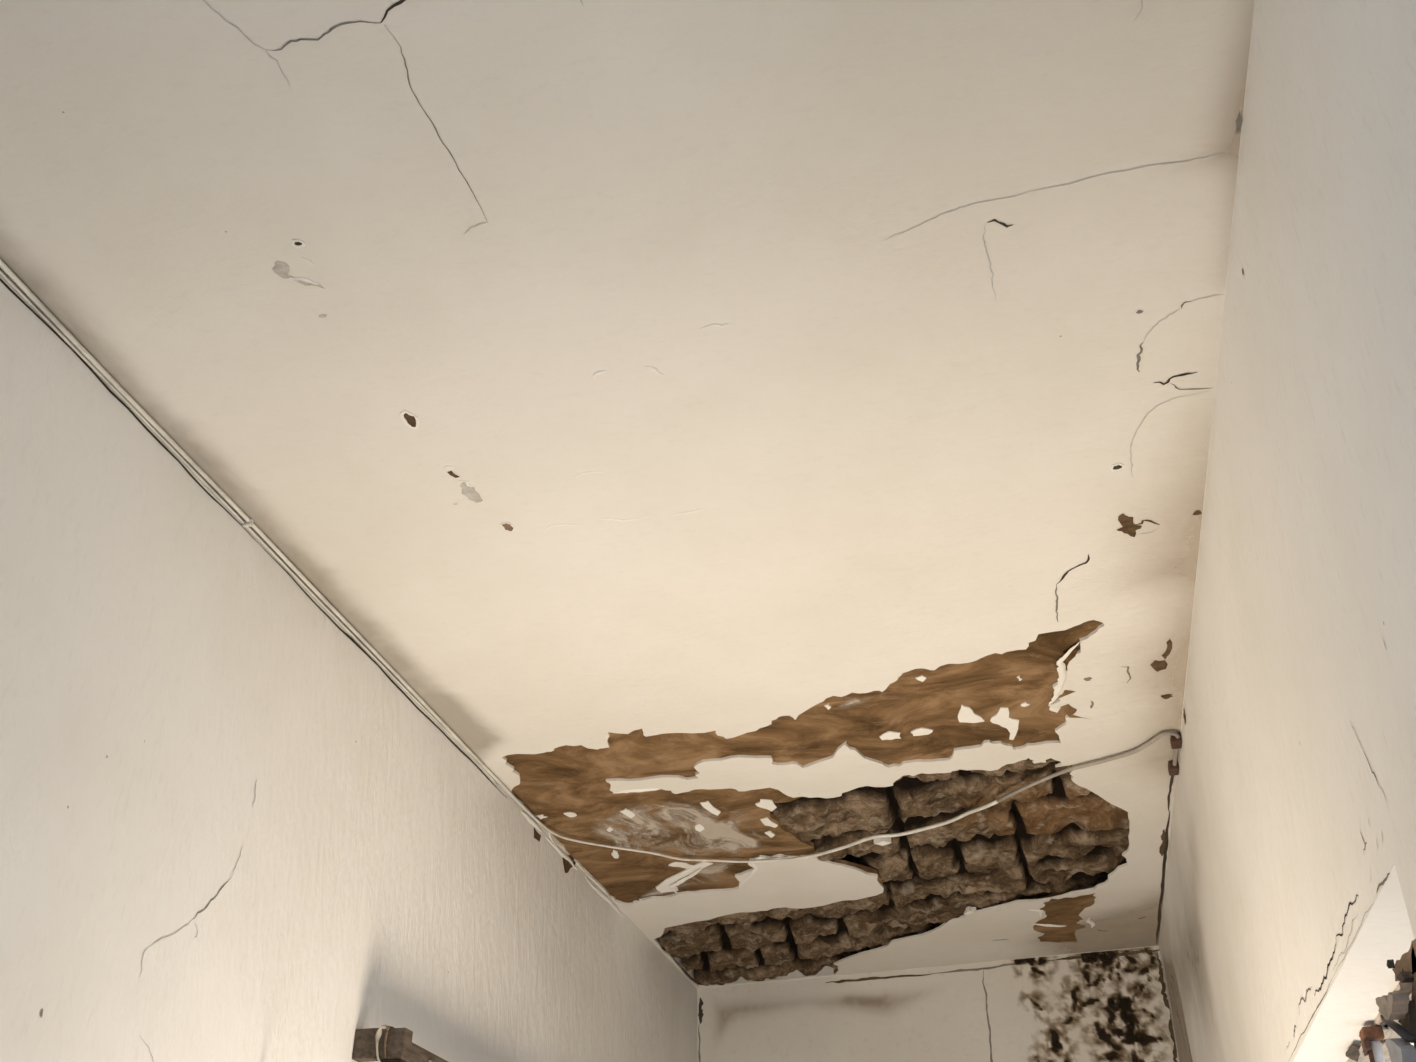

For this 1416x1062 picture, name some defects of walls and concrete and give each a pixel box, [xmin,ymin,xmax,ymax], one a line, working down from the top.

crack [203,0,487,234]
crack [1055,555,1090,622]
flaking render [1117,514,1161,537]
damp [1175,510,1202,582]
damp [1161,636,1190,733]
flaking render [504,620,1130,986]
damp [1013,903,1193,1062]
crack [1287,873,1390,1058]